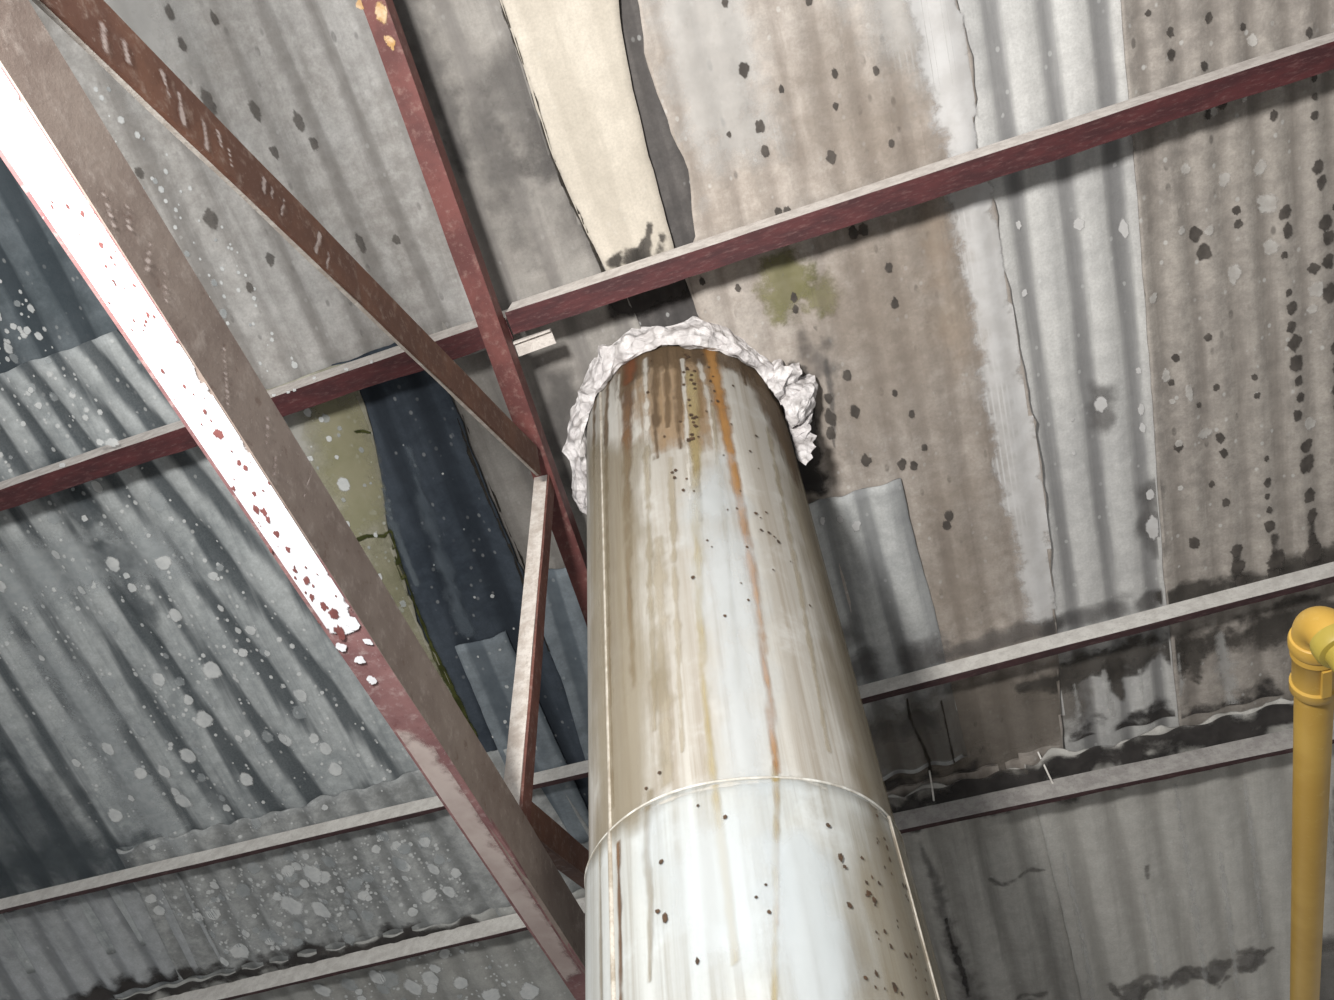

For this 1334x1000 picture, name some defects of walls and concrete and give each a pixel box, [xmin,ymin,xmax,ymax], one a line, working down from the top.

leakage [739,62,749,78]
leakage [755,119,769,157]
leakage [607,224,665,267]
leakage [1189,226,1211,260]
leakage [1279,204,1292,259]
leakage [1307,204,1334,303]
leakage [608,277,705,318]
leakage [1286,289,1304,421]
leakage [1156,438,1334,604]
corrosion [592,345,799,1000]
leakage [869,595,1334,821]
corrosion [865,837,909,906]